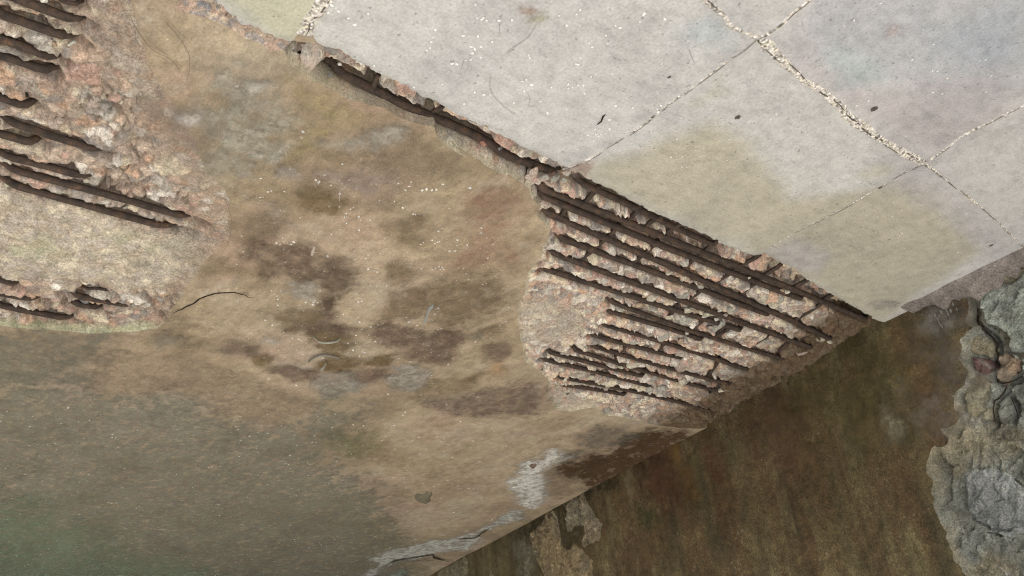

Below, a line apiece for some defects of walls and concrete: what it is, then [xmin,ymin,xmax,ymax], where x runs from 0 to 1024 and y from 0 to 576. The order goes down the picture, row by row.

spalling [0,0,230,334]
crack [171,284,254,313]
leakage [0,204,639,576]
peeling [437,557,468,576]
spalling [172,0,872,429]
peeling [529,493,603,576]
spalling [926,269,1024,576]
crack [977,308,1023,424]